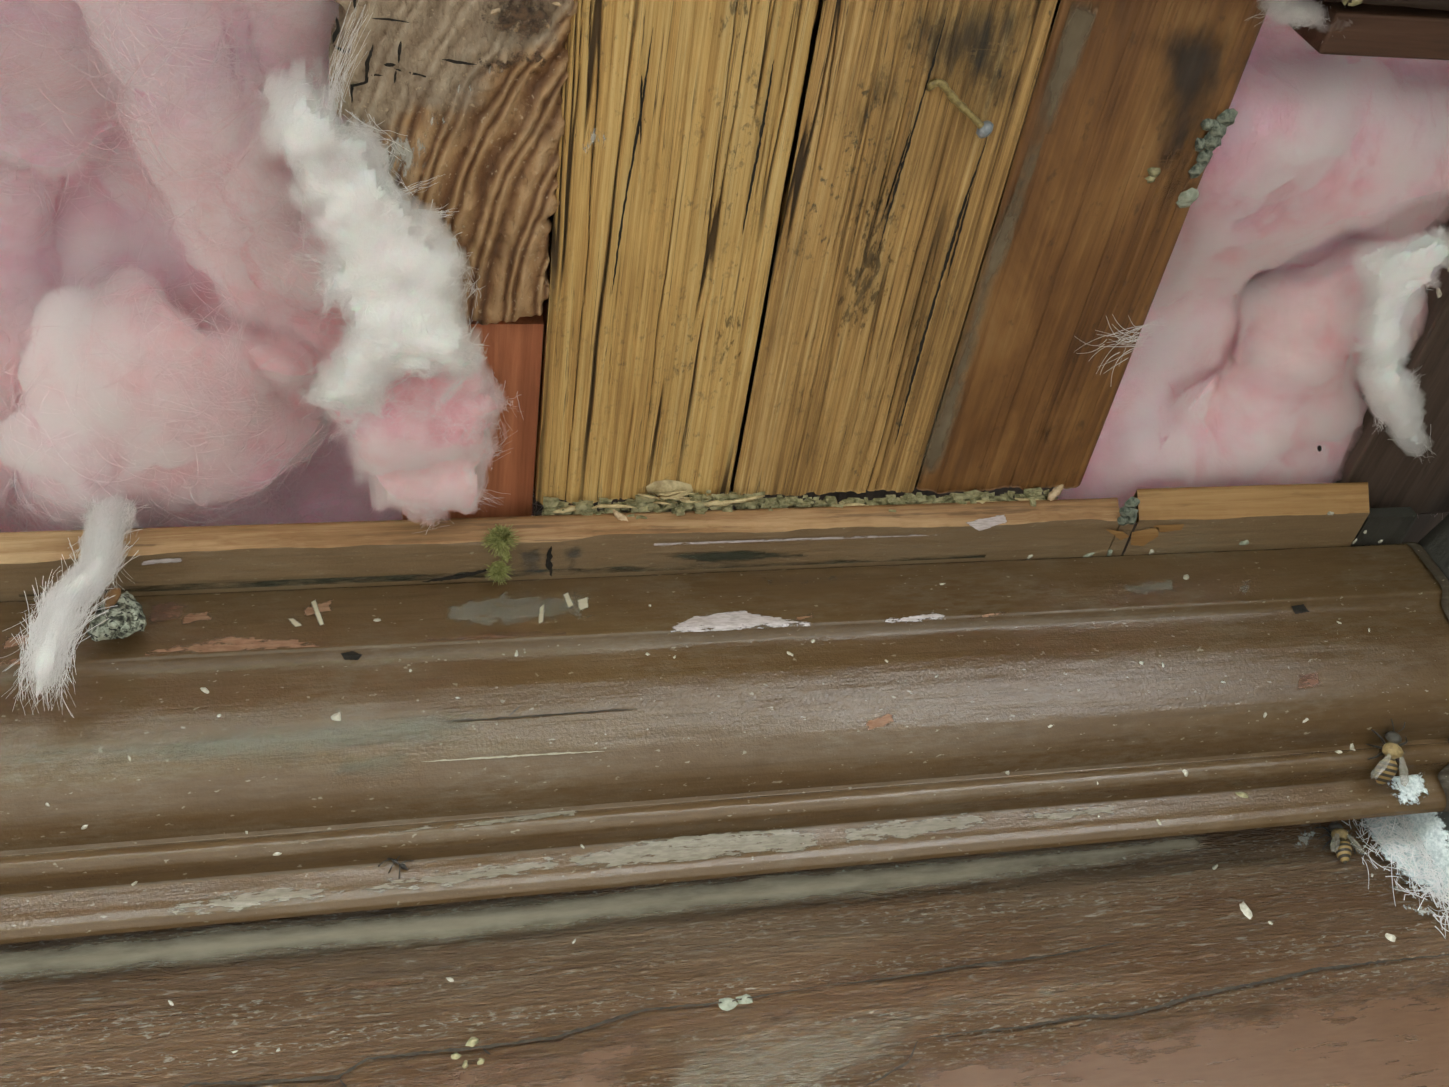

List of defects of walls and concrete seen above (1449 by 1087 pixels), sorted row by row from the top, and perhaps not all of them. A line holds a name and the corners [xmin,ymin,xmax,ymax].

peeling [183,612,212,624]
peeling [145,637,319,655]
peeling [389,810,576,833]
peeling [844,813,983,843]
peeling [1027,805,1114,820]
peeling [361,829,817,893]
peeling [168,887,344,915]
crack [183,941,1125,1087]
crack [864,954,1449,1087]